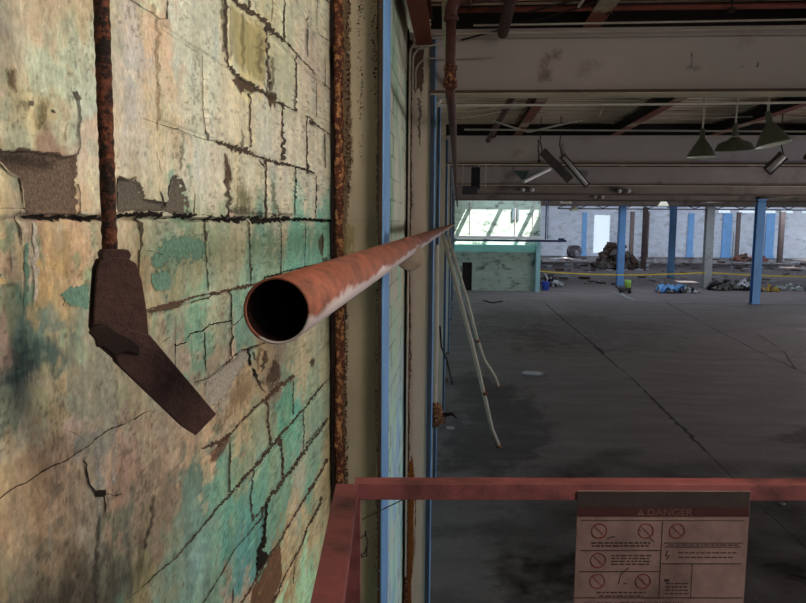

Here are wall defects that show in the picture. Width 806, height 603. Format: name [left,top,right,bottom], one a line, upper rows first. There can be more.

rust [343,0,379,256]
spalling [0,147,78,215]
spalling [116,175,196,214]
peeling [151,233,206,291]
peeling [61,284,89,309]
crack [0,0,331,603]
peeling [204,351,248,407]
crack [545,303,733,478]
rust [407,500,416,603]